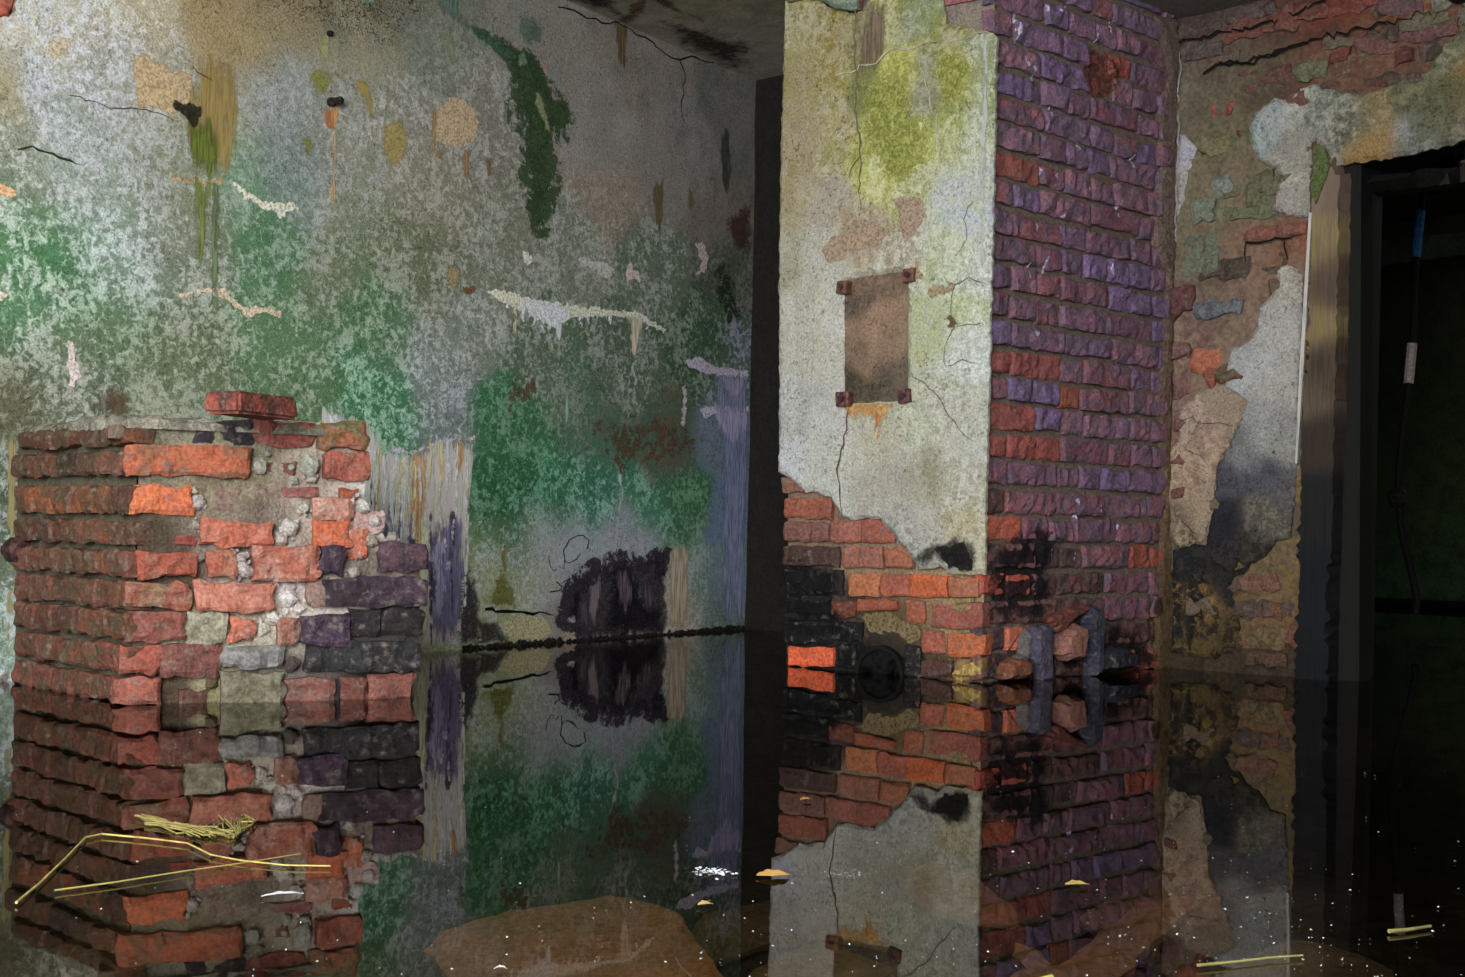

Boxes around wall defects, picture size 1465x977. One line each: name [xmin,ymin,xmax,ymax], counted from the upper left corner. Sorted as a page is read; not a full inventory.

flaking render [0,0,17,18]
damp [0,184,17,198]
flaking render [132,53,192,114]
damp [171,119,299,318]
flaking render [432,96,491,177]
crack [558,6,715,124]
crack [1174,0,1439,241]
damp [488,289,667,398]
flaking render [1169,0,1465,668]
damp [322,356,749,649]